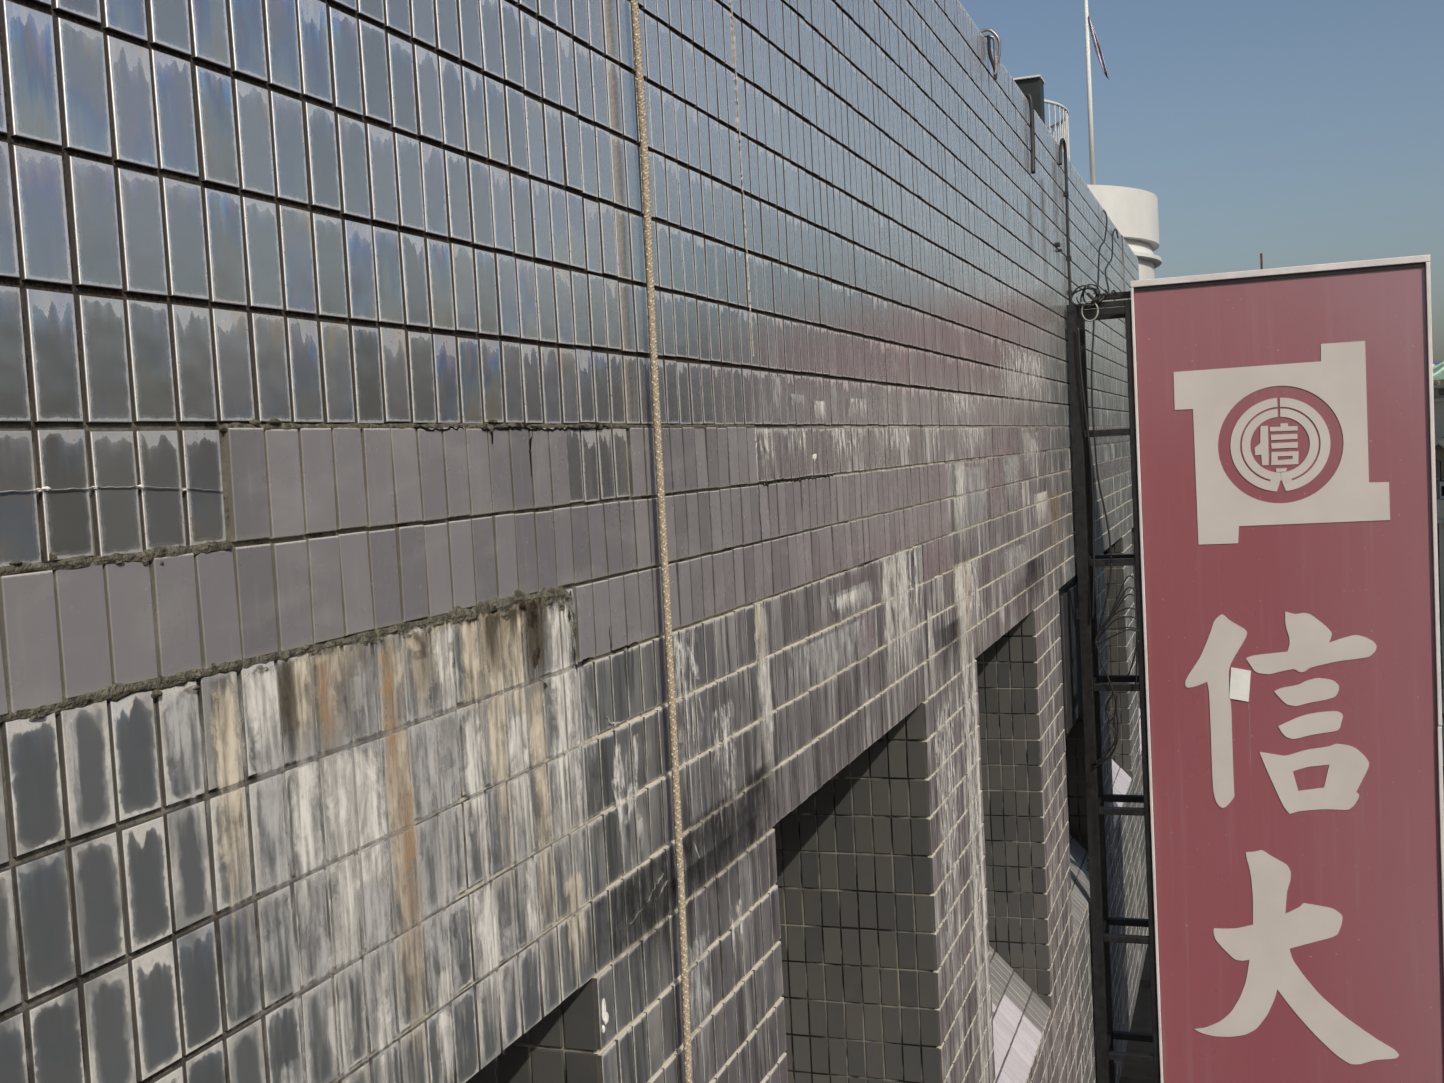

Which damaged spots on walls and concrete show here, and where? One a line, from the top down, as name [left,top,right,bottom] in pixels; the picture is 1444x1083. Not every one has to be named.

damp [956,463,986,535]
damp [1034,491,1047,520]
corrosion [316,654,340,727]
damp [674,633,735,785]
damp [755,603,773,758]
damp [791,550,934,682]
corrosion [380,645,422,966]
damp [612,736,641,838]
damp [935,559,990,1082]
damp [690,937,709,1034]